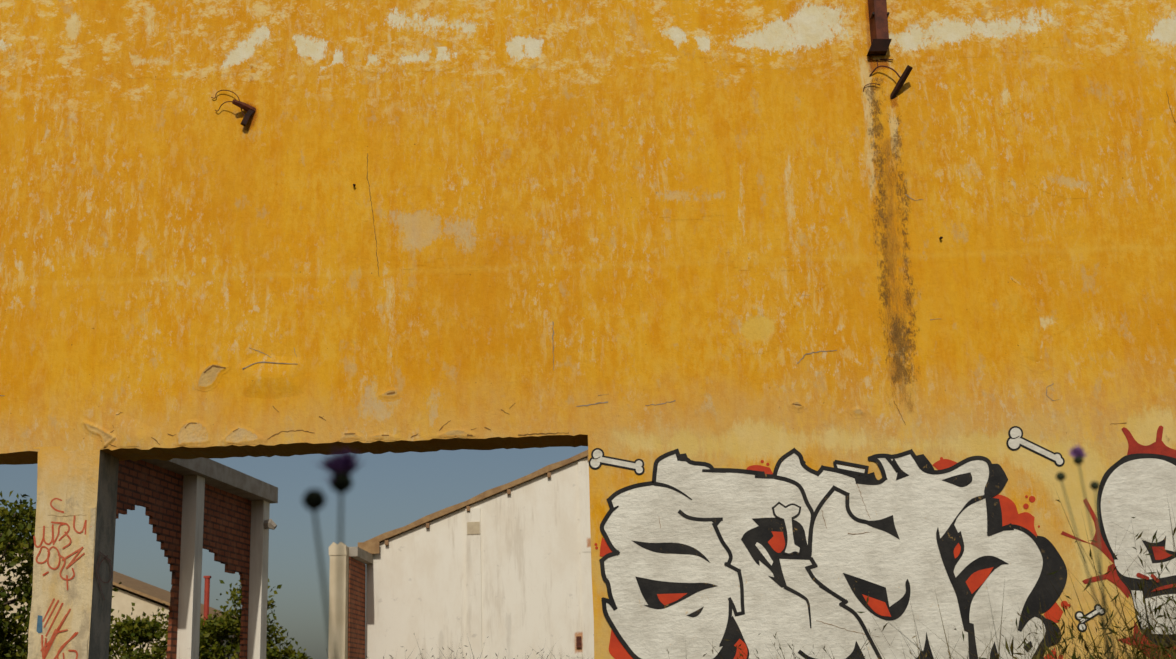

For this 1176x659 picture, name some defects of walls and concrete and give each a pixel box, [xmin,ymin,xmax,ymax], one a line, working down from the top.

peeling [212,0,550,75]
peeling [652,0,868,69]
peeling [886,0,1080,67]
peeling [1130,0,1176,63]
damp [845,49,915,387]
spalling [194,360,231,392]
spalling [173,417,267,447]
peeling [337,357,479,441]